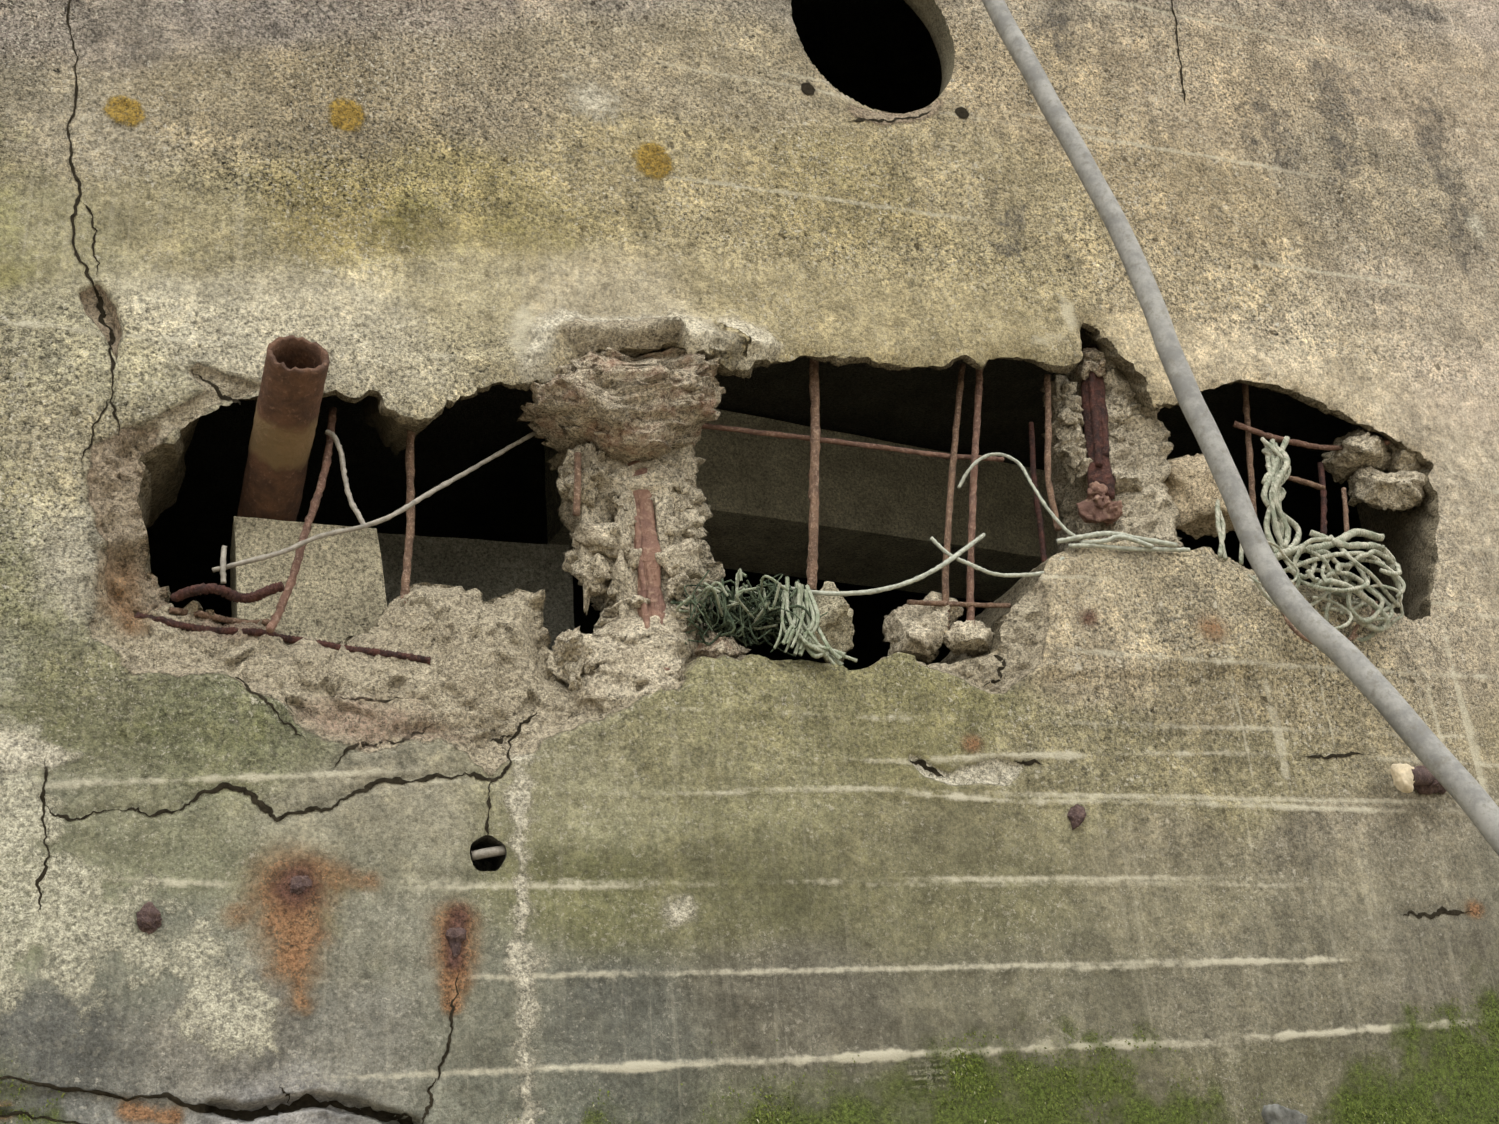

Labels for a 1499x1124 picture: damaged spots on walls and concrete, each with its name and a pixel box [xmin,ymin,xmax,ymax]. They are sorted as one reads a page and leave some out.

crack [66,0,125,462]
spalling [87,362,643,776]
spalling [916,578,1049,694]
crack [35,677,537,913]
spalling [909,756,1023,786]
rust [255,854,375,1010]
rust [435,905,475,1012]
crack [0,973,459,1124]